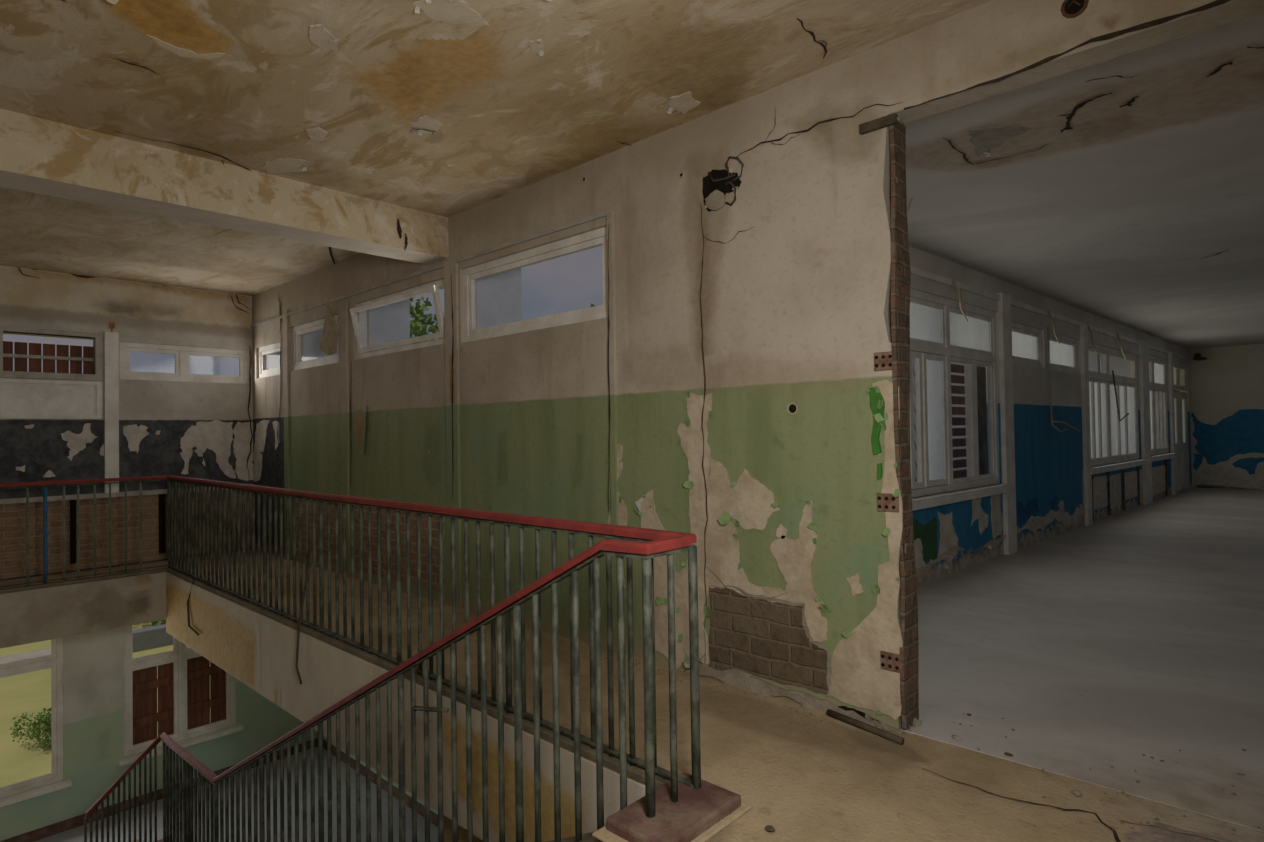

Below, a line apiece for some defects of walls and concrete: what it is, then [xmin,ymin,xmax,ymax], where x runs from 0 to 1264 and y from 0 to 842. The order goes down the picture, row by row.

crack [736,0,1231,165]
crack [1206,46,1264,77]
peeling [61,423,104,460]
peeling [123,424,161,455]
peeling [177,420,280,482]
spalling [654,117,1143,734]
peeling [1191,409,1264,475]
peeling [605,443,666,531]
crack [923,768,1121,842]